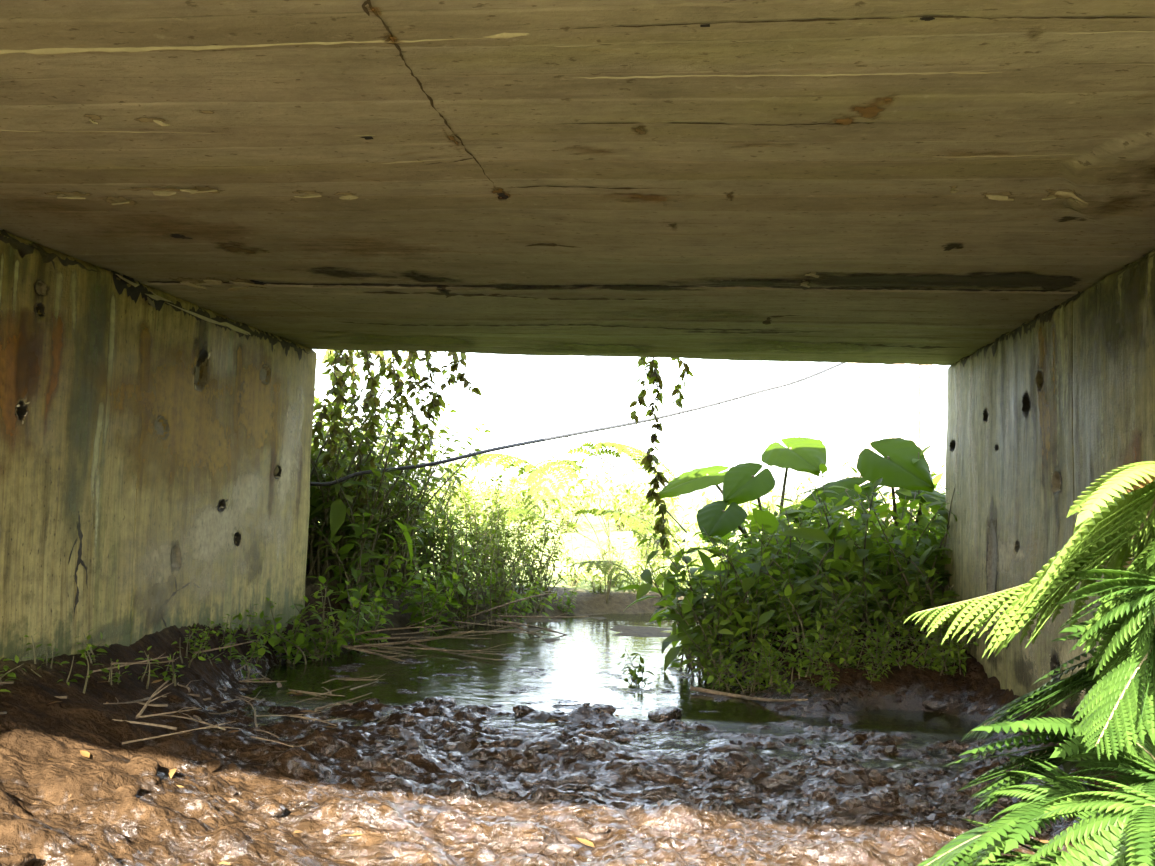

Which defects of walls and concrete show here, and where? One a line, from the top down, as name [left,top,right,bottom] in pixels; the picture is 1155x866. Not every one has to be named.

crack [362,0,683,200]
damp [0,244,79,356]
damp [312,267,388,278]
damp [598,272,1080,291]
rust [0,310,64,451]
crack [68,515,88,626]